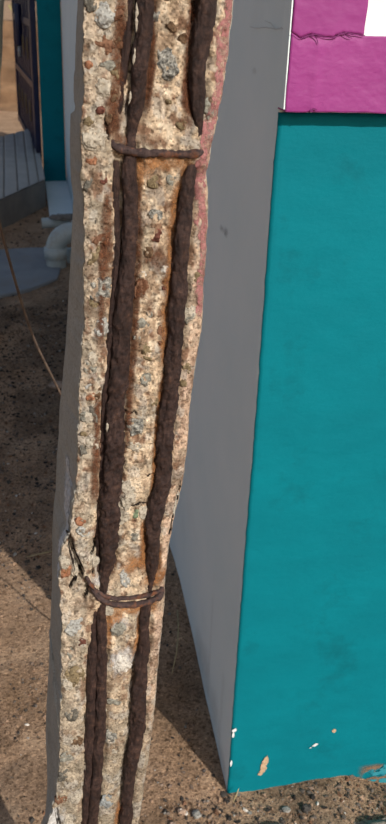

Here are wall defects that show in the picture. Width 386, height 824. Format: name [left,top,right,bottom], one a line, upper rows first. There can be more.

corrosion [105,0,127,145]
corrosion [144,0,157,110]
corrosion [182,0,195,122]
crack [249,21,365,44]
corrosion [97,197,112,343]
corrosion [126,157,186,442]
corrosion [92,401,101,499]
spalling [46,0,233,824]
corrosion [151,380,163,489]
crack [66,530,96,598]
corrosion [127,523,146,572]
peeling [363,764,386,783]